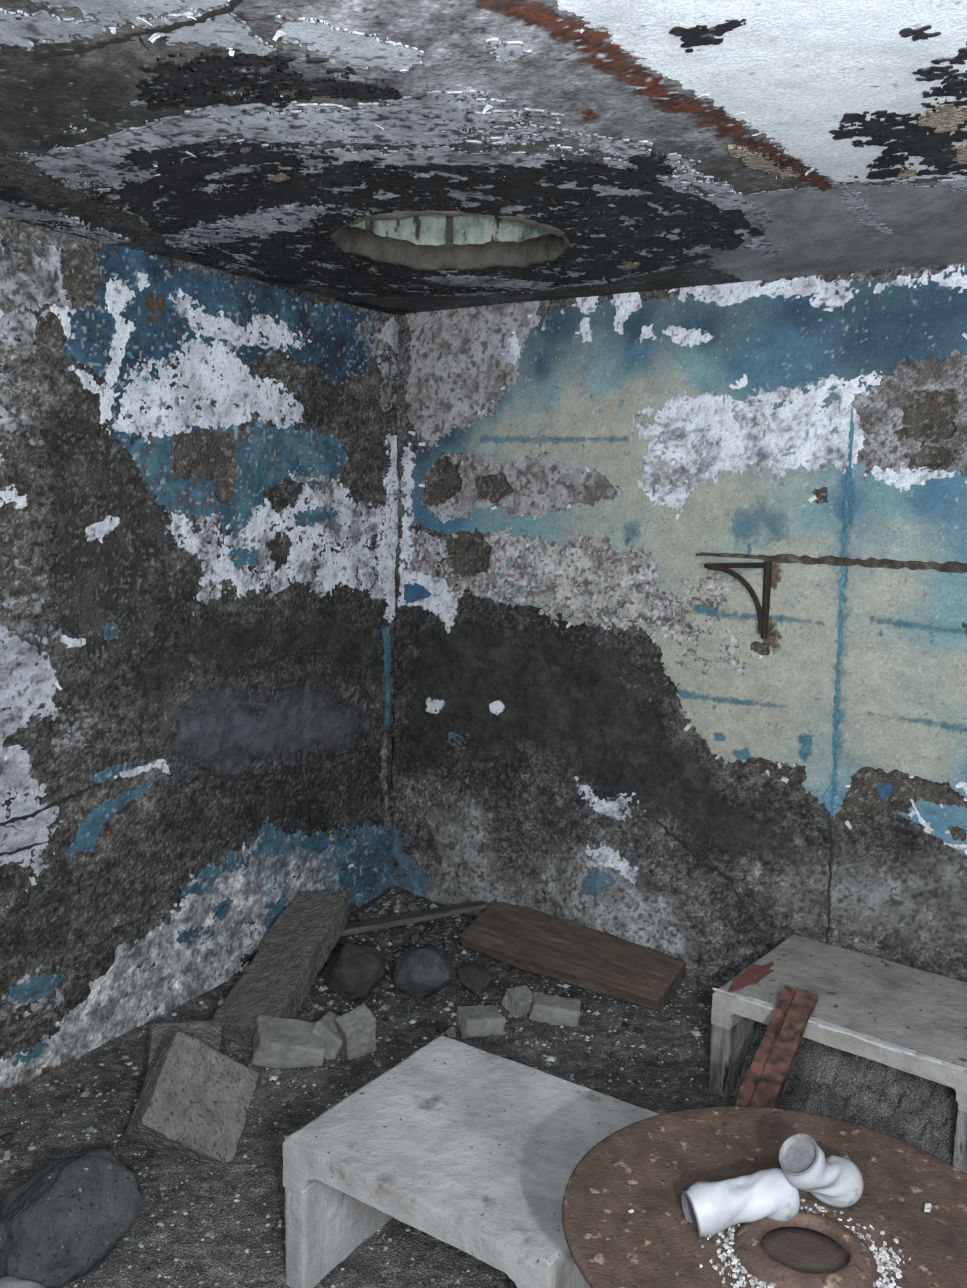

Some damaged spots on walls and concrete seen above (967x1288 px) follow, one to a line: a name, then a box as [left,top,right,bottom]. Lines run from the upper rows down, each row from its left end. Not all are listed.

rust [477,0,834,191]
peeling [0,0,967,892]
rust [759,559,781,588]
leakage [693,606,795,622]
rust [757,618,781,655]
leakage [678,690,775,708]
leakage [162,625,393,845]
leakage [715,733,749,759]
leakage [799,735,812,762]
leakage [422,797,696,967]
peeling [0,816,456,1089]